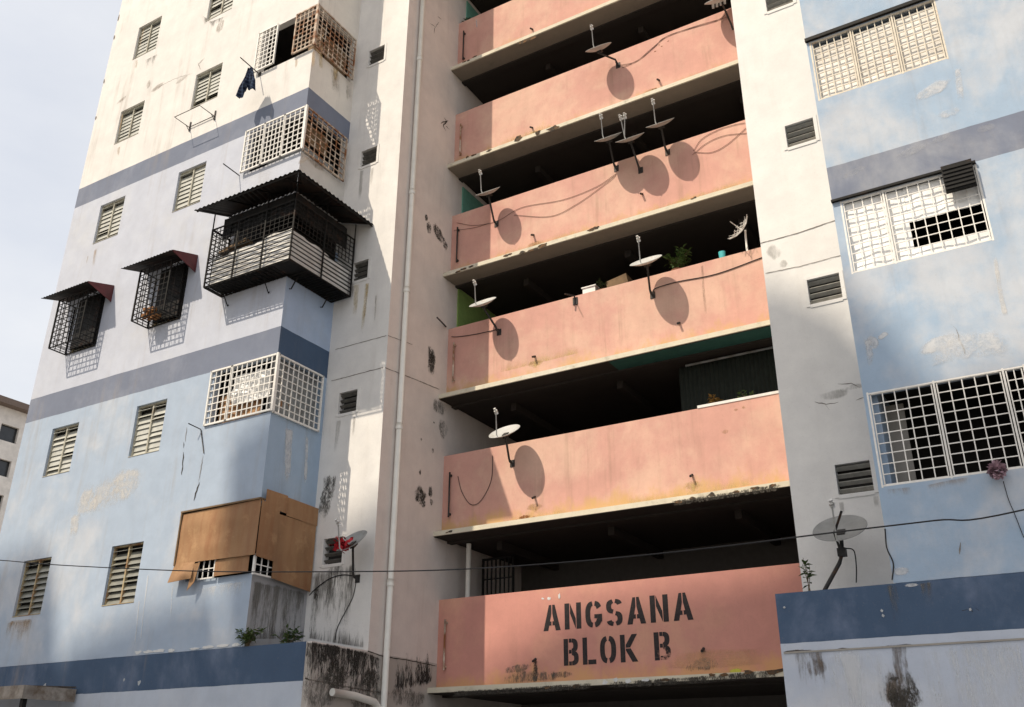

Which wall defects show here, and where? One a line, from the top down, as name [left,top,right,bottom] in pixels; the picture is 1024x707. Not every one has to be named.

crack [181,429,203,499]
leakage [319,477,335,513]
leakage [415,471,433,507]
leakage [252,566,353,639]
leakage [301,631,380,707]
leakage [394,659,432,706]
leakage [453,660,590,697]
leakage [612,651,775,688]
leakage [885,648,921,707]